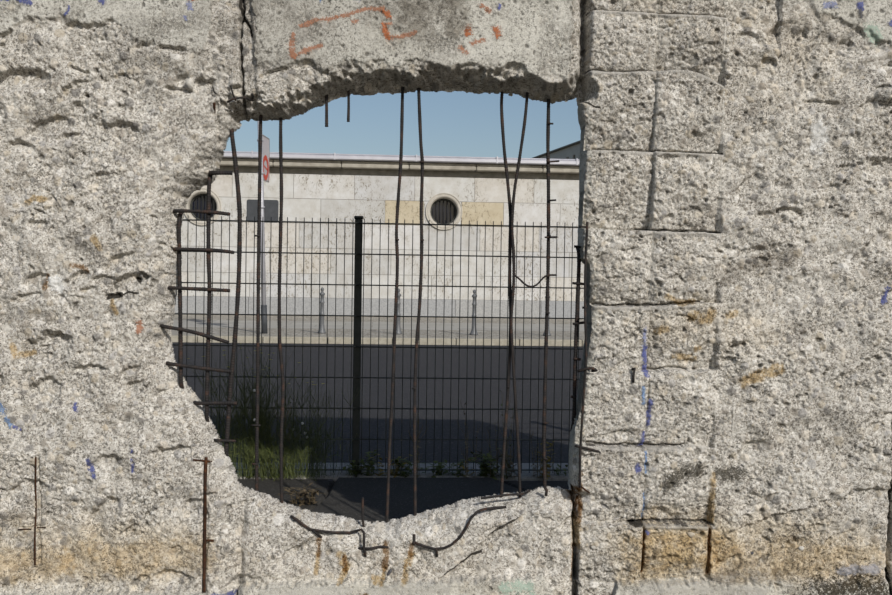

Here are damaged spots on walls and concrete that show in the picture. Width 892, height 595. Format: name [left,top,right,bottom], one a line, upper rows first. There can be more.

crack [239,0,253,37]
spalling [0,0,646,595]
spalling [241,0,892,589]
crack [884,484,892,519]
crack [884,567,892,595]